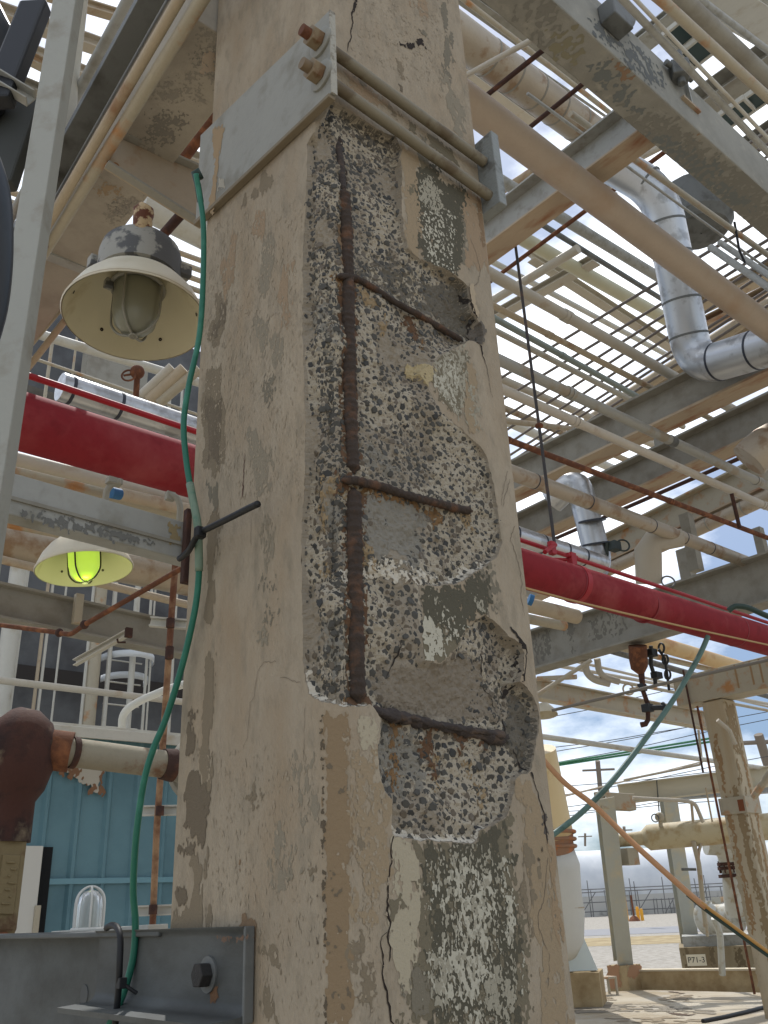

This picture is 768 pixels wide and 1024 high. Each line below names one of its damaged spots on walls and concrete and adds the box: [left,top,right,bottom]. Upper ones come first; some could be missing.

crack [348,0,357,47]
rust [315,224,443,706]
crack [380,836,394,1024]
spalling [301,102,539,1024]
rust [385,711,507,814]
crack [480,471,550,984]